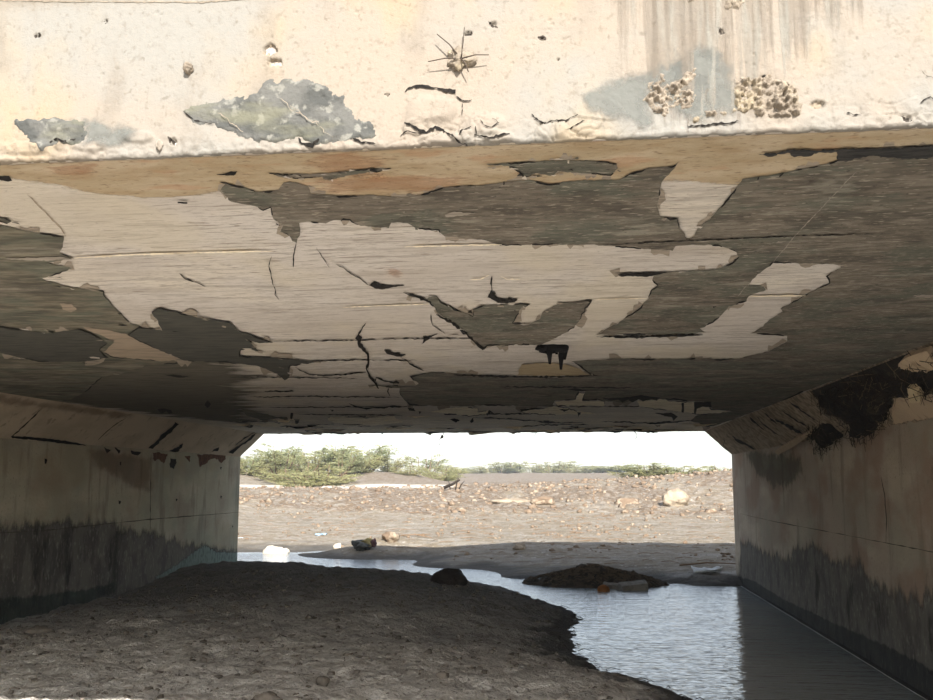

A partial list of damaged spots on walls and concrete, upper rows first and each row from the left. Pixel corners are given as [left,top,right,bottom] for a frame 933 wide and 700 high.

leakage [585,0,735,126]
leakage [779,0,839,58]
spalling [14,117,87,151]
peeling [0,218,326,402]
crack [230,316,478,422]
peeling [212,142,933,454]
leakage [0,517,237,603]
leakage [738,541,933,699]